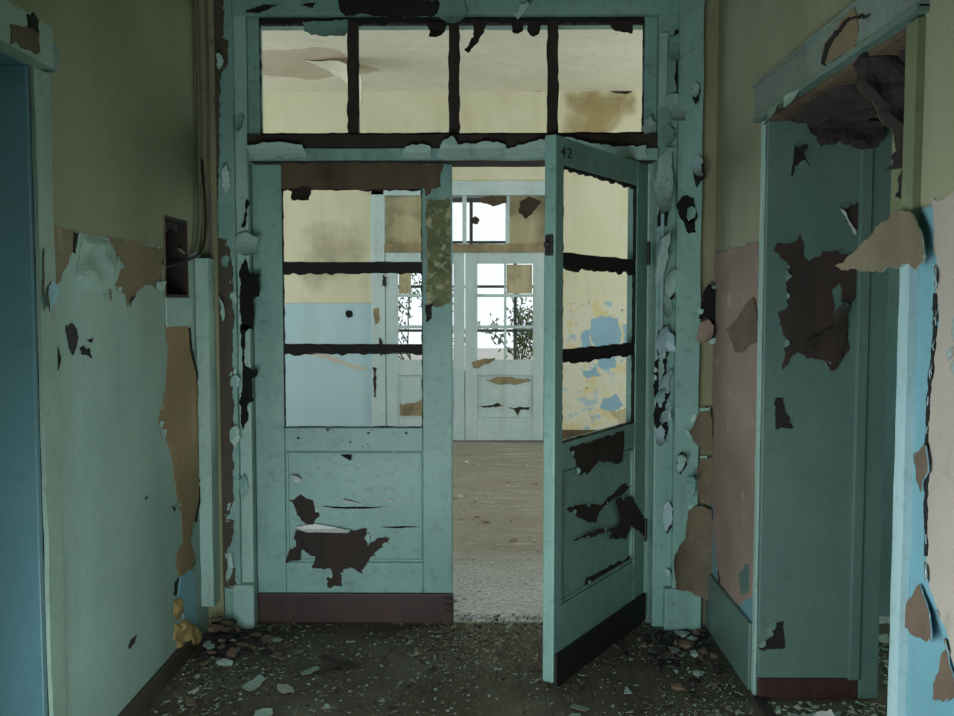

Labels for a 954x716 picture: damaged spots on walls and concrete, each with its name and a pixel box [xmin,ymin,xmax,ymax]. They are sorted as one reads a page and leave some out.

peeling [302,0,487,53]
damp [569,92,632,133]
peeling [563,300,627,349]
peeling [774,233,857,372]
flaking render [158,324,201,623]
peeling [218,232,259,591]
peeling [286,475,390,589]
peeling [562,356,626,477]
peeling [567,483,645,541]
flaking render [664,243,761,605]
flaking render [905,191,954,702]
peeling [148,550,758,716]